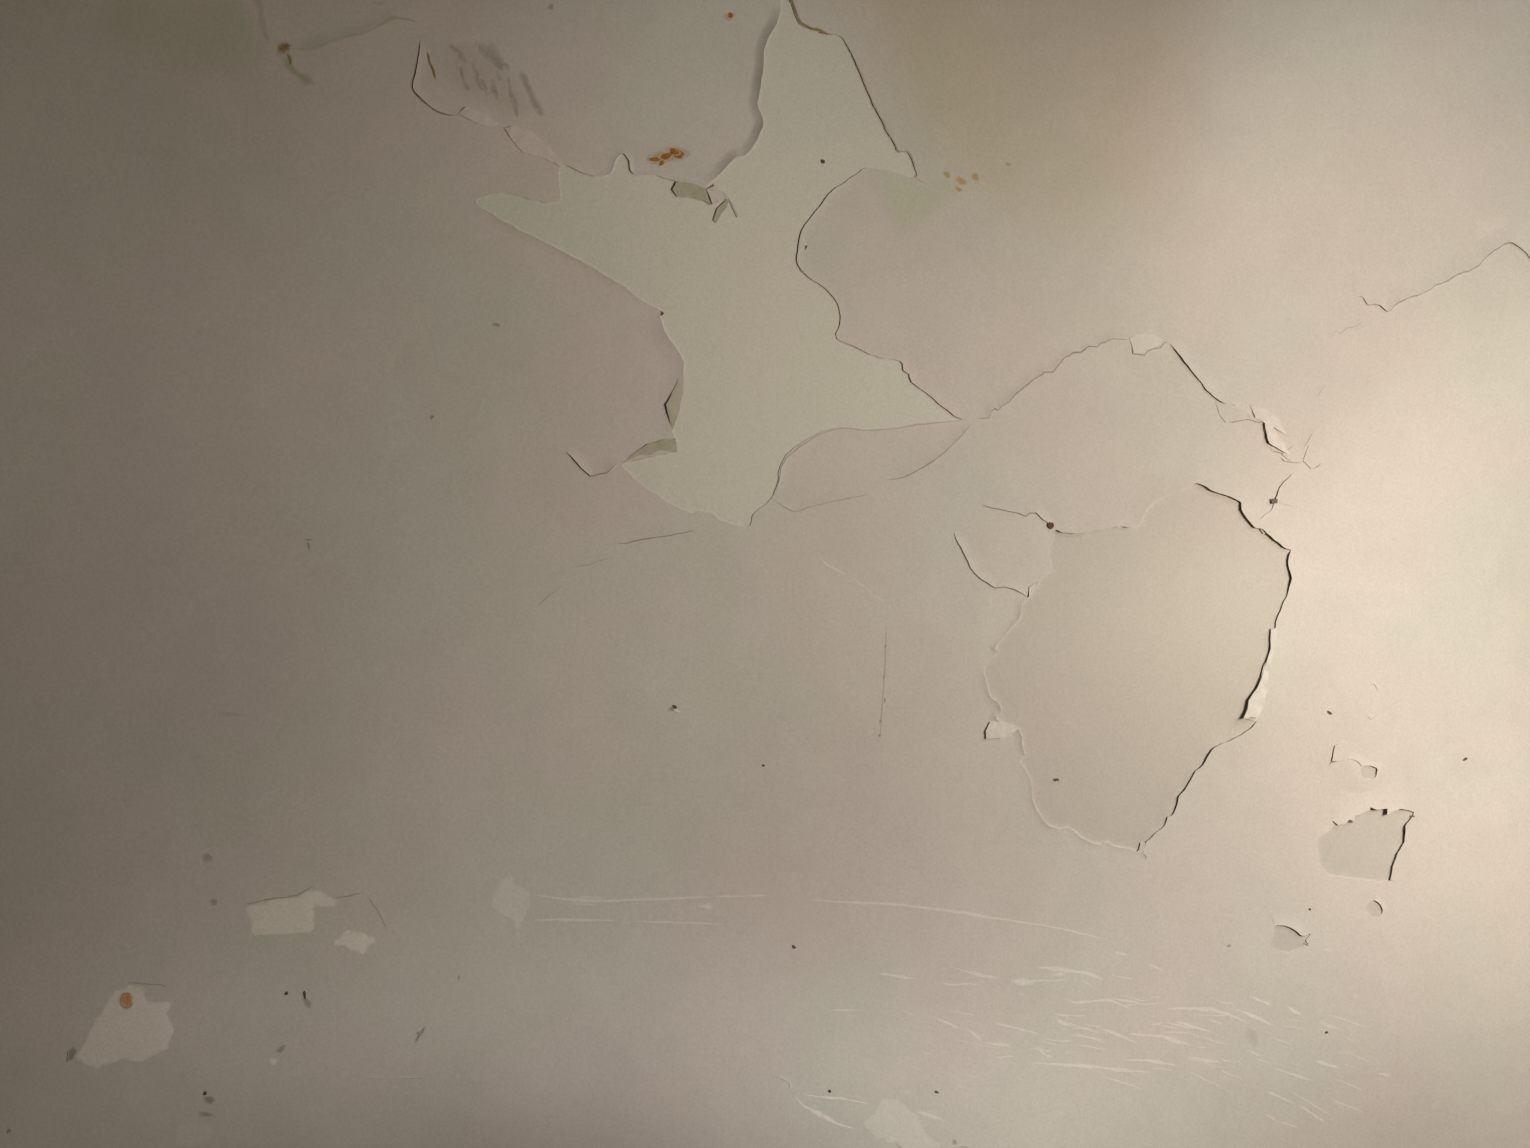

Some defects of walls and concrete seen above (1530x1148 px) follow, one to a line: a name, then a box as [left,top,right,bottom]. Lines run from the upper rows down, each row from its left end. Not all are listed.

rust [648,145,692,166]
peeling [458,0,975,527]
peeling [977,453,1314,860]
peeling [1313,769,1419,918]
rust [119,991,134,1010]